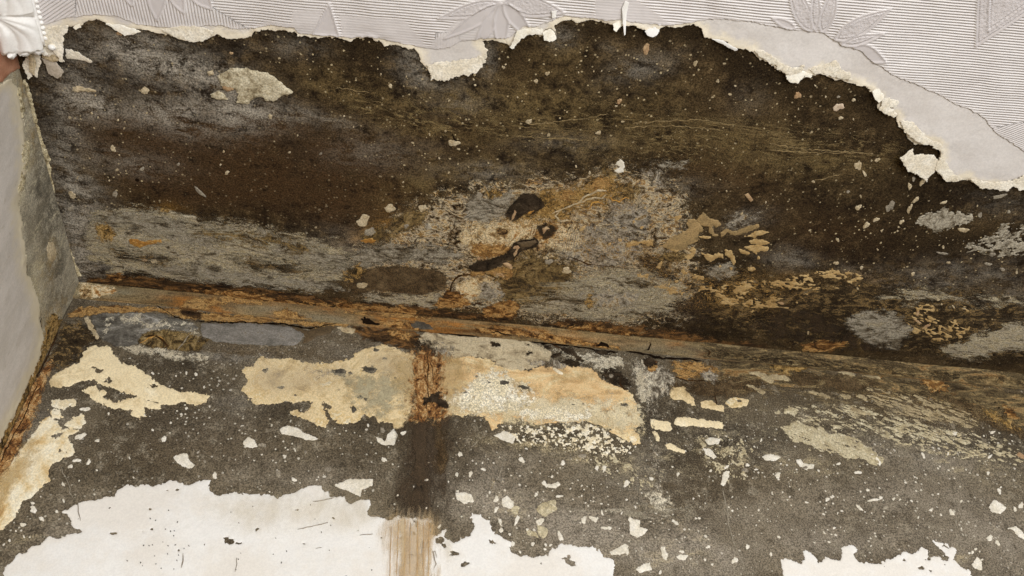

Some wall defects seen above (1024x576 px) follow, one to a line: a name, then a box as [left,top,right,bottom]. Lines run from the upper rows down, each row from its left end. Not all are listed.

water stain [625,119,734,130]
water stain [770,143,872,154]
peeling [0,24,92,443]
water stain [48,316,101,370]
peeling [0,344,615,576]
rust [0,273,769,479]
water stain [389,415,452,576]
water stain [78,157,1024,491]
peeling [438,356,791,514]
rust [801,339,849,353]
peeling [769,512,983,576]
peeling [774,371,1024,475]